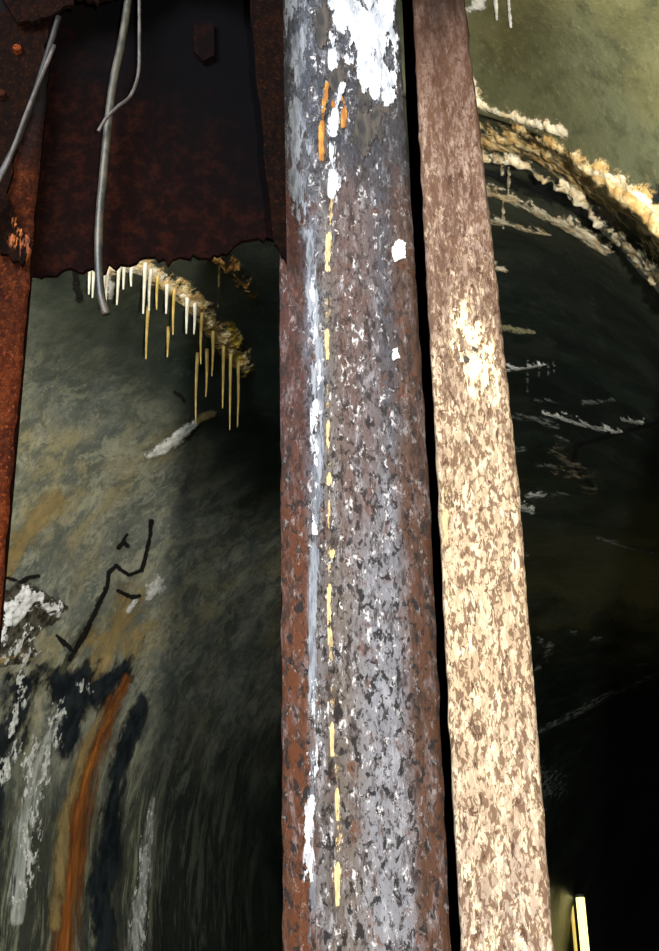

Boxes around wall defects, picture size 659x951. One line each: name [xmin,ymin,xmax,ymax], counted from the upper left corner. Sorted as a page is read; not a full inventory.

damp [466,0,512,28]
corrosion [9,218,34,261]
corrosion [318,81,347,161]
peeling [392,239,406,262]
damp [476,97,659,293]
damp [88,259,253,459]
peeling [284,0,400,949]
crack [6,574,40,584]
spalling [0,582,69,668]
crack [55,519,154,674]
damp [0,575,166,951]
corrosion [50,674,131,951]